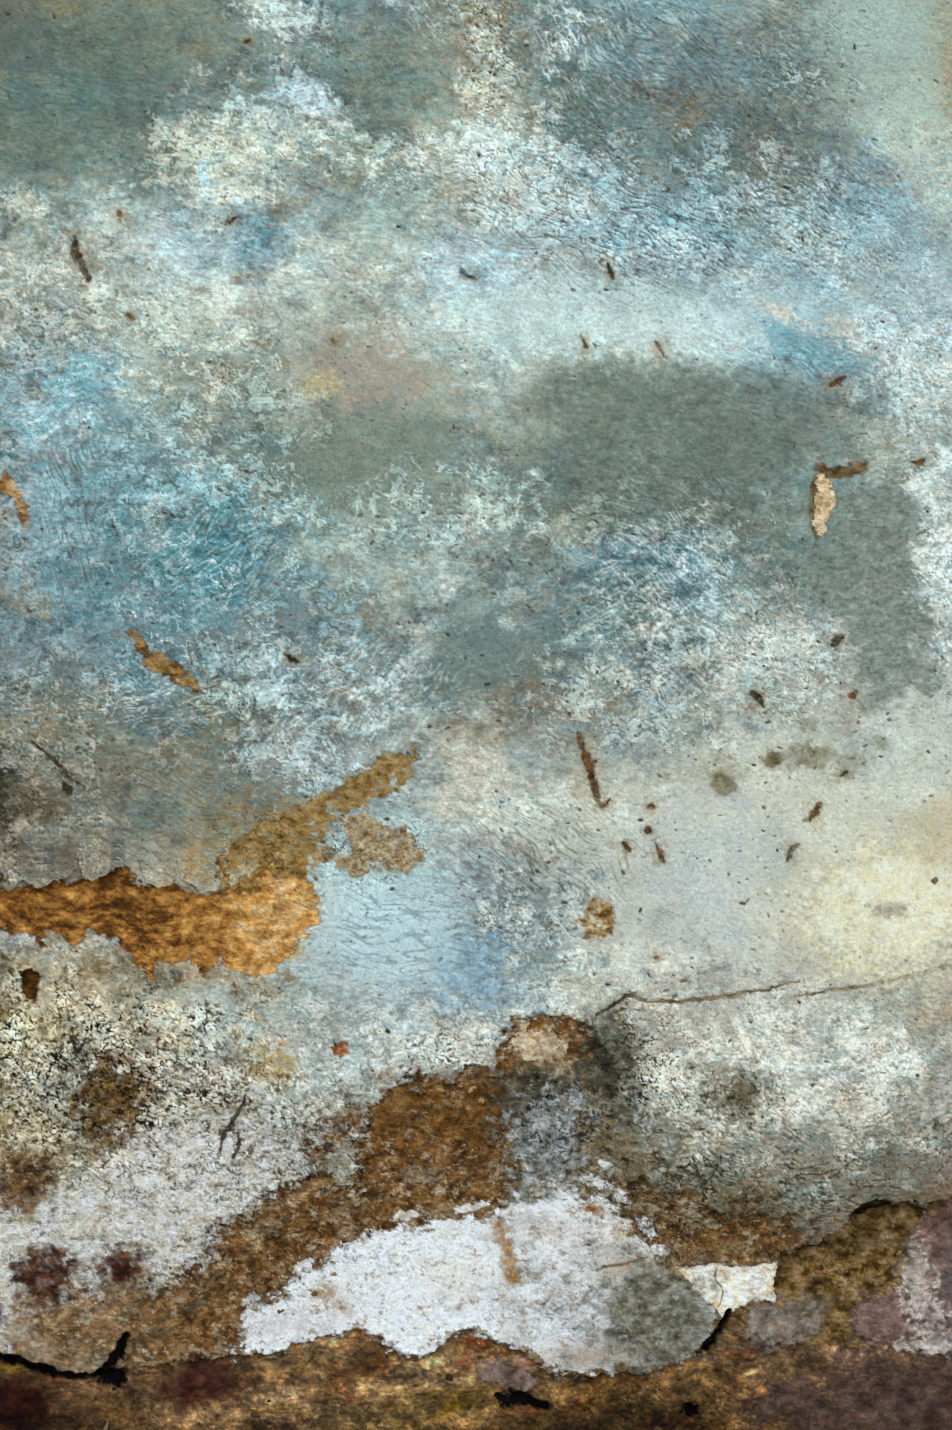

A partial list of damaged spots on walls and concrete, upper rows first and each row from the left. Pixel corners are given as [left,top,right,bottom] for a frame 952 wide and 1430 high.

peeling [0,470,29,531]
peeling [809,461,868,538]
water stain [794,479,942,710]
peeling [126,628,201,693]
water stain [0,768,69,850]
flaking render [0,744,425,981]
crack [596,964,952,1016]
flaking render [0,1014,952,1430]